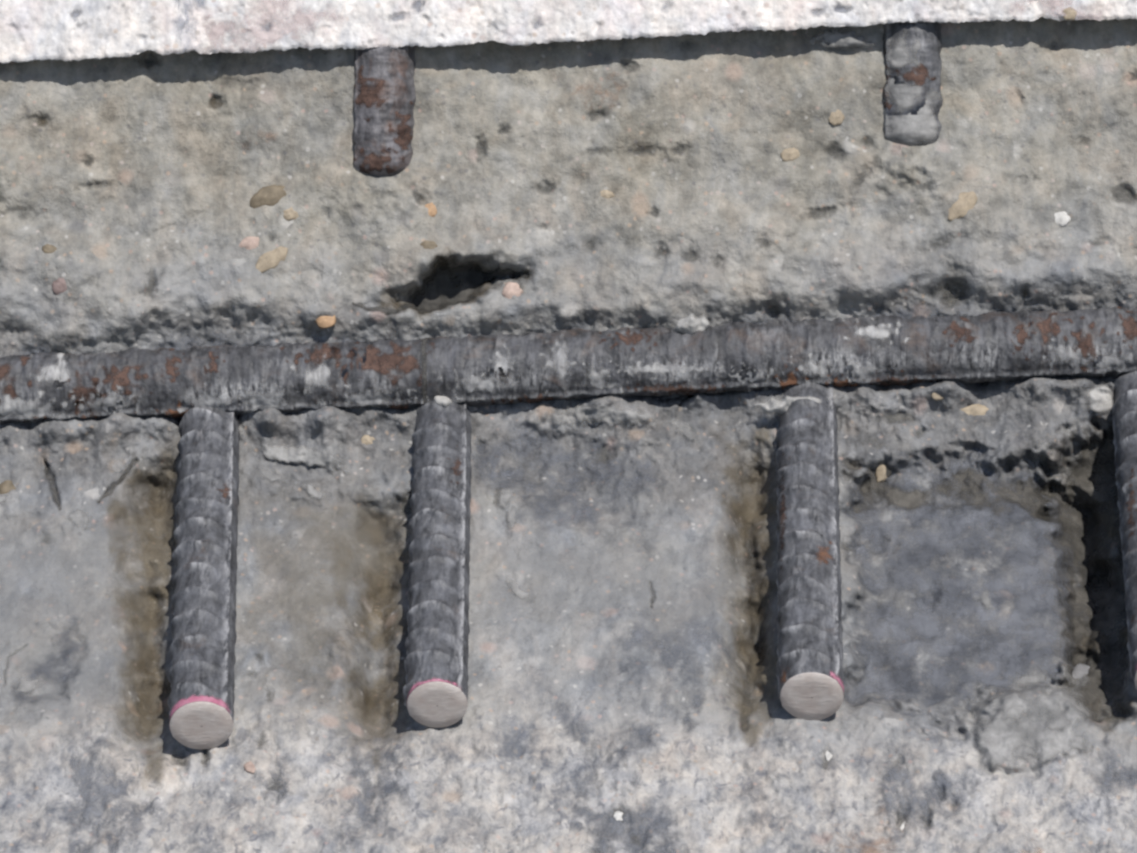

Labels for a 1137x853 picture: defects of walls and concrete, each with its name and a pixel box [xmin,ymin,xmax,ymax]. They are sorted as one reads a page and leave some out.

corrosion [354,66,385,121]
corrosion [883,63,936,109]
corrosion [353,101,413,174]
spalling [353,256,530,315]
corrosion [0,356,32,400]
corrosion [61,365,148,419]
corrosion [280,342,422,387]
corrosion [491,393,567,404]
corrosion [826,370,937,387]
corrosion [1013,306,1137,372]
spalling [844,419,1130,772]
spalling [14,636,78,700]